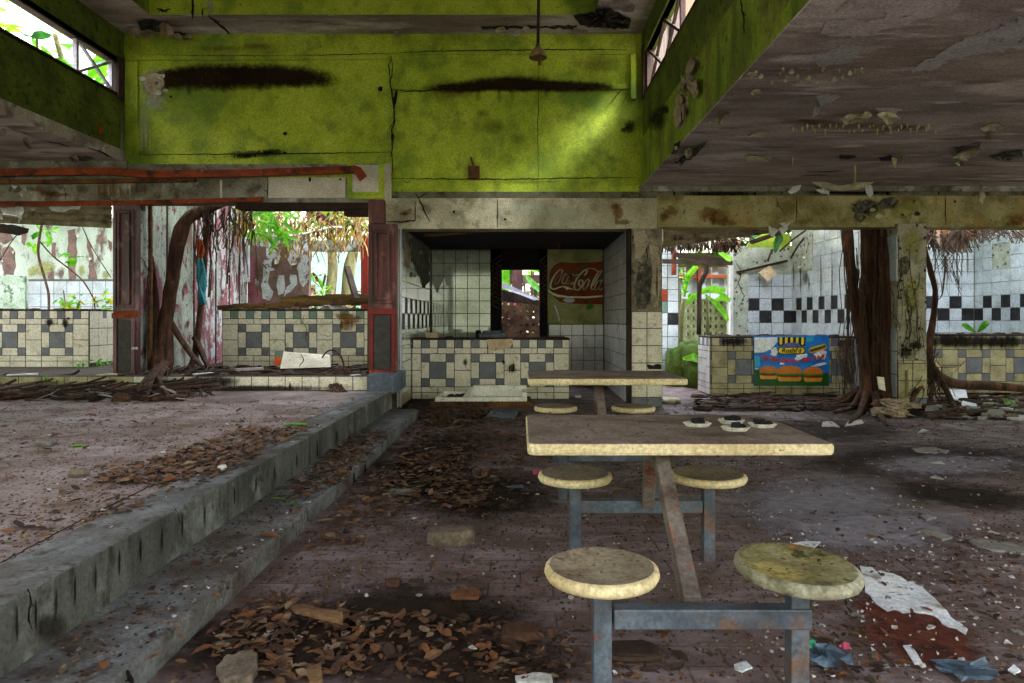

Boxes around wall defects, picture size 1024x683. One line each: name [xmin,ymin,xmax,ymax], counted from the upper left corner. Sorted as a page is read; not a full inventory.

water stain [156,65,330,89]
water stain [432,76,612,92]
peeling [741,0,961,118]
crack [139,0,635,227]
peeling [840,108,903,125]
corrosion [702,208,734,225]
spalling [788,182,921,225]
peeling [173,241,193,343]